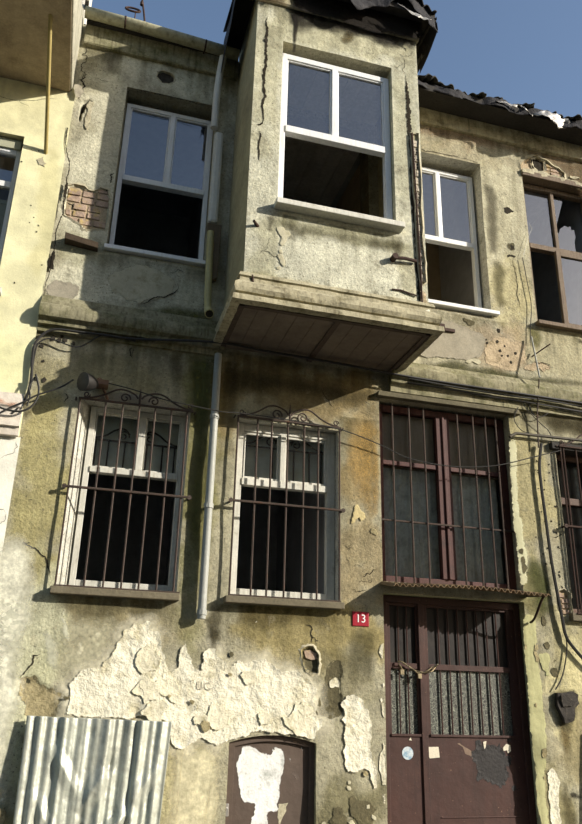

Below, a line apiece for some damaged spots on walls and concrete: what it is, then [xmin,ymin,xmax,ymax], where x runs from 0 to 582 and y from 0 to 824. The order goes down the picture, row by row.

crack [257,19,269,158]
crack [44,46,108,294]
spalling [61,182,112,232]
crack [397,51,478,301]
spalling [518,154,582,190]
spalling [466,329,551,372]
crack [22,542,50,572]
peeling [508,439,528,585]
leakage [207,608,220,648]
flaking render [19,619,387,824]
peeling [523,614,562,824]